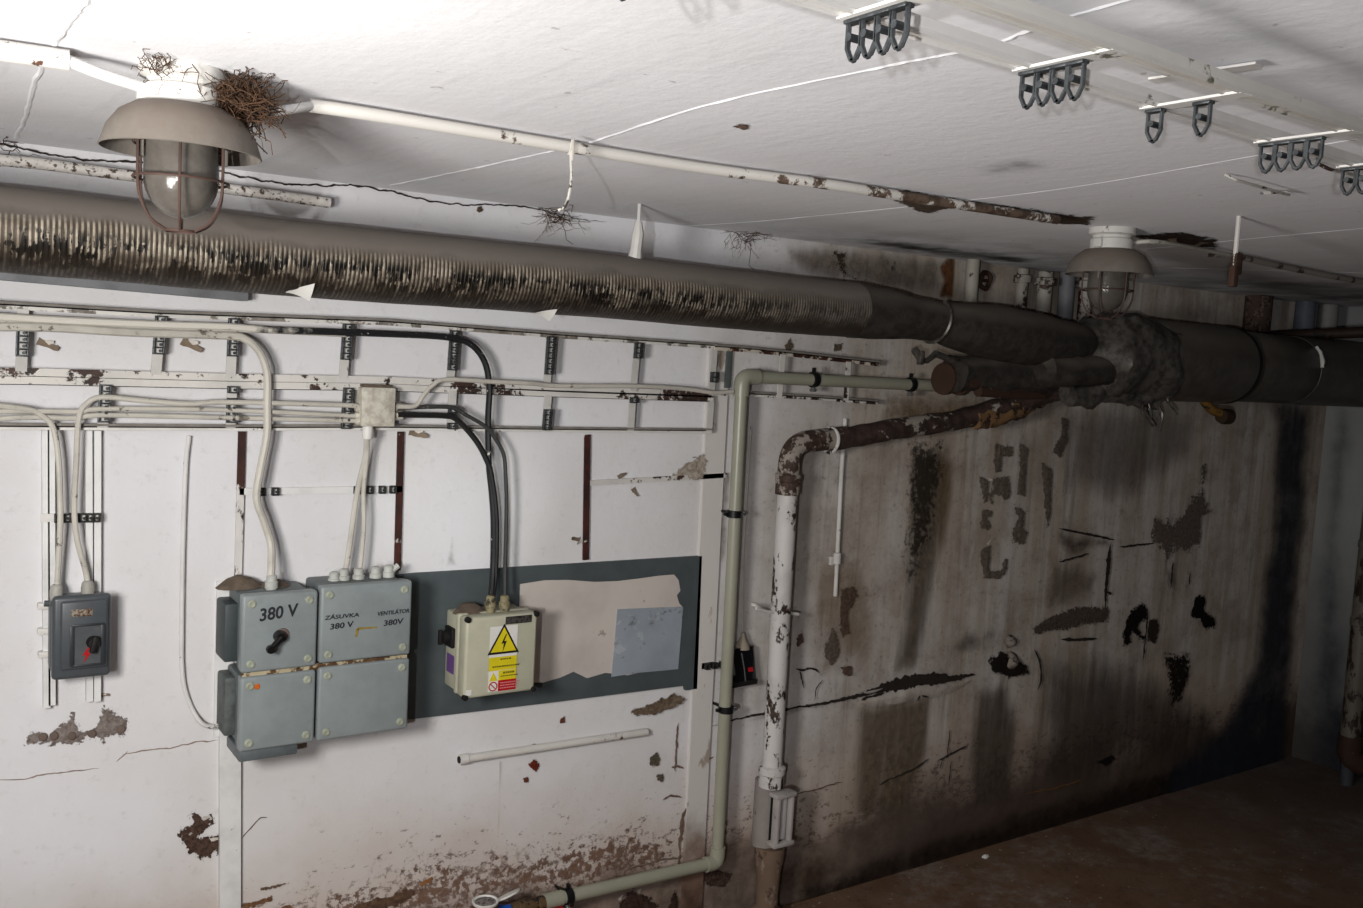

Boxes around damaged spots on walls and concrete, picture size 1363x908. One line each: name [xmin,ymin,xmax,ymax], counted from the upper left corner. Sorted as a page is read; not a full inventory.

peeling [979,417,1069,579]
damp [779,408,1306,902]
spalling [23,693,127,747]
peeling [631,693,685,717]
crack [1,740,215,780]
crack [627,667,975,870]
spalling [177,809,219,860]
spalling [618,888,678,908]